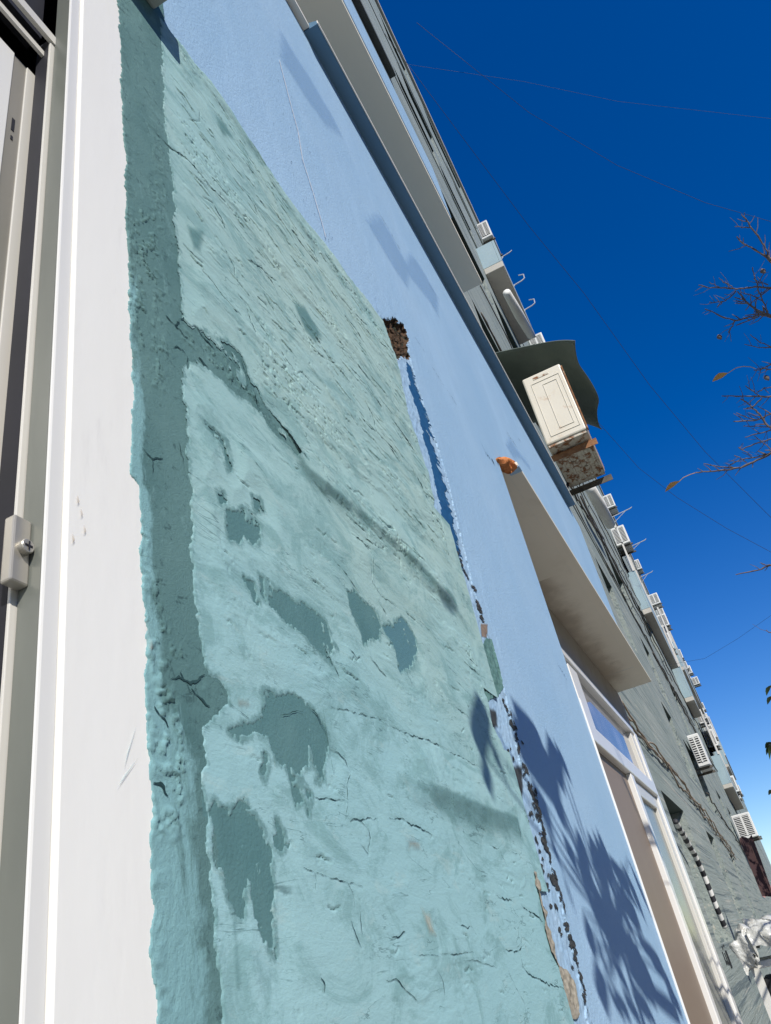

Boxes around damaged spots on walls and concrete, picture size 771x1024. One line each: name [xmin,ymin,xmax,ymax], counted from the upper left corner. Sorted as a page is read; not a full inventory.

crack [167,316,213,368]
spalling [383,316,411,361]
peeling [117,0,300,1024]
peeling [242,577,333,666]
peeling [347,589,418,672]
crack [343,522,438,642]
crack [153,781,168,796]
crack [171,672,248,718]
peeling [228,692,328,816]
crack [283,708,479,852]
crack [392,710,589,1013]
spalling [528,787,580,1019]